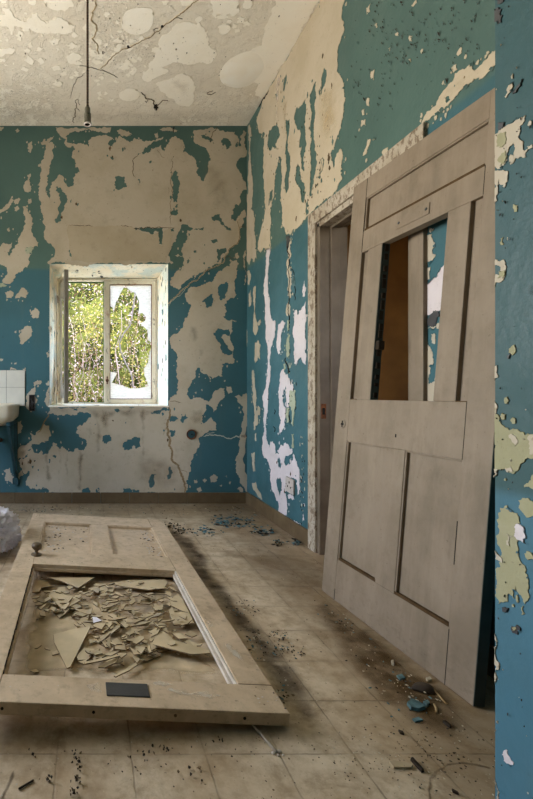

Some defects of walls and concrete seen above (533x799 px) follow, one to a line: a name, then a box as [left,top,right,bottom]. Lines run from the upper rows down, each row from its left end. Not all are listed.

crack [70,0,198,123]
peeling [420,47,495,129]
peeling [505,74,523,98]
peeling [495,115,533,202]
peeling [0,0,348,525]
peeling [427,228,444,401]
peeling [495,259,507,285]
crack [163,401,186,492]
peeling [493,397,533,481]
peeling [494,475,533,615]